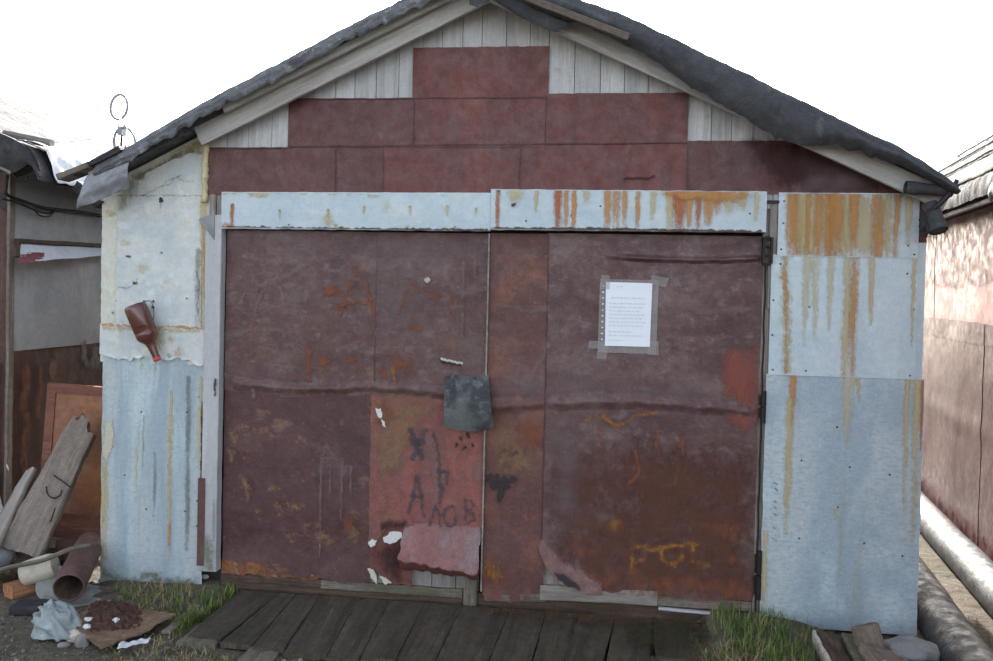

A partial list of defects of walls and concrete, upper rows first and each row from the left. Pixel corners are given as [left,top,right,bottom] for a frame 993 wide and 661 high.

rust [221,190,762,232]
rust [780,194,912,506]
rust [903,379,924,507]
peeling [344,519,407,585]
rust [629,541,710,573]